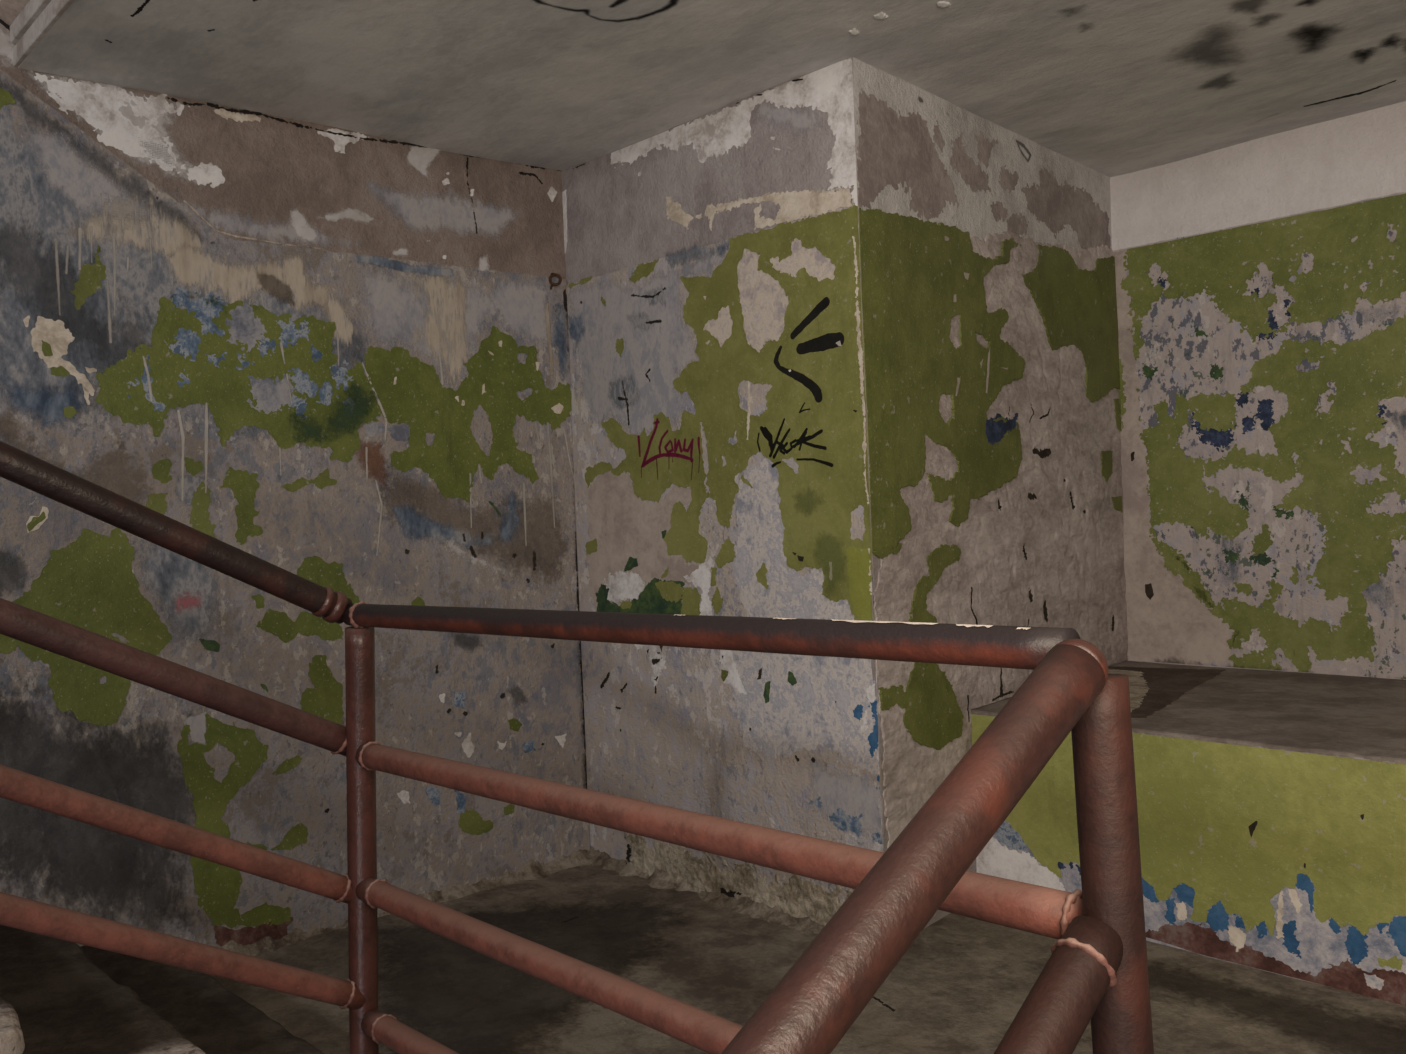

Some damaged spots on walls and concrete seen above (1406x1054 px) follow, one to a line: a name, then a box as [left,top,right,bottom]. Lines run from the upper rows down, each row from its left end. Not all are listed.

leakage [0,84,553,449]
peeling [12,88,1406,672]
leakage [72,446,146,503]
leakage [385,467,566,579]
peeling [0,634,130,726]
peeling [251,594,344,725]
peeling [634,644,666,694]
peeling [177,712,302,838]
peeling [190,856,293,946]
peeling [719,650,1033,848]
peeling [976,732,1081,891]
peeling [1132,733,1406,990]